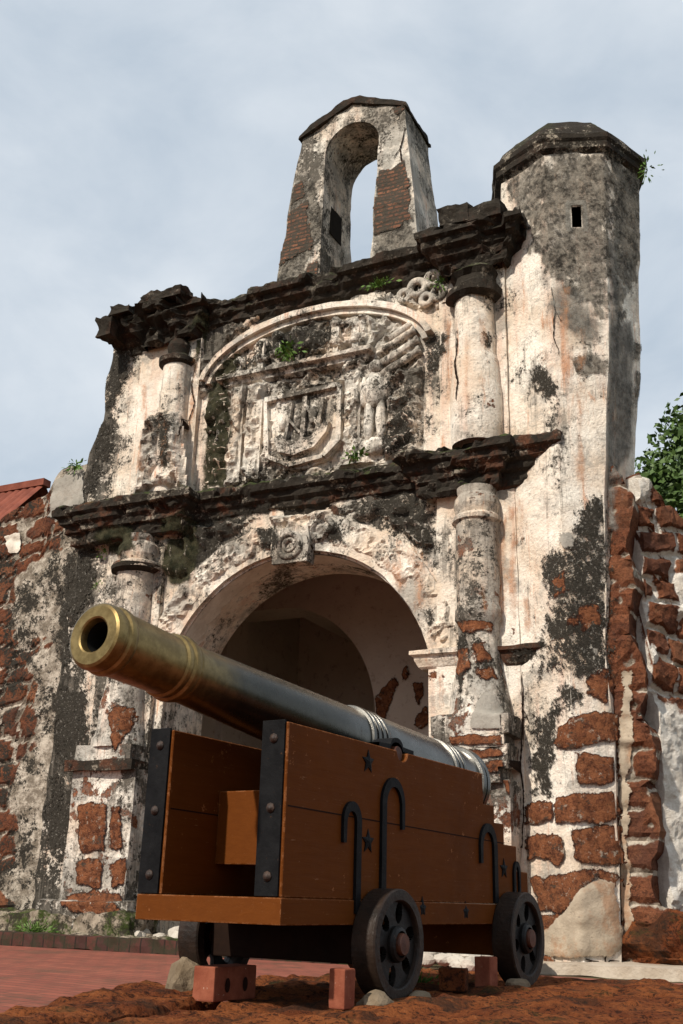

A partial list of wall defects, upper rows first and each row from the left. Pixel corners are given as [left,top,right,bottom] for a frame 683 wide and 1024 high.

spalling [279,180,318,274]
spalling [373,160,411,236]
crack [452,338,460,399]
crack [551,287,562,355]
damp [502,144,640,528]
peeling [4,533,21,553]
spalling [456,619,498,680]
spalling [107,704,139,752]
spalling [375,666,429,729]
spalling [524,711,628,930]
spalling [60,801,128,914]